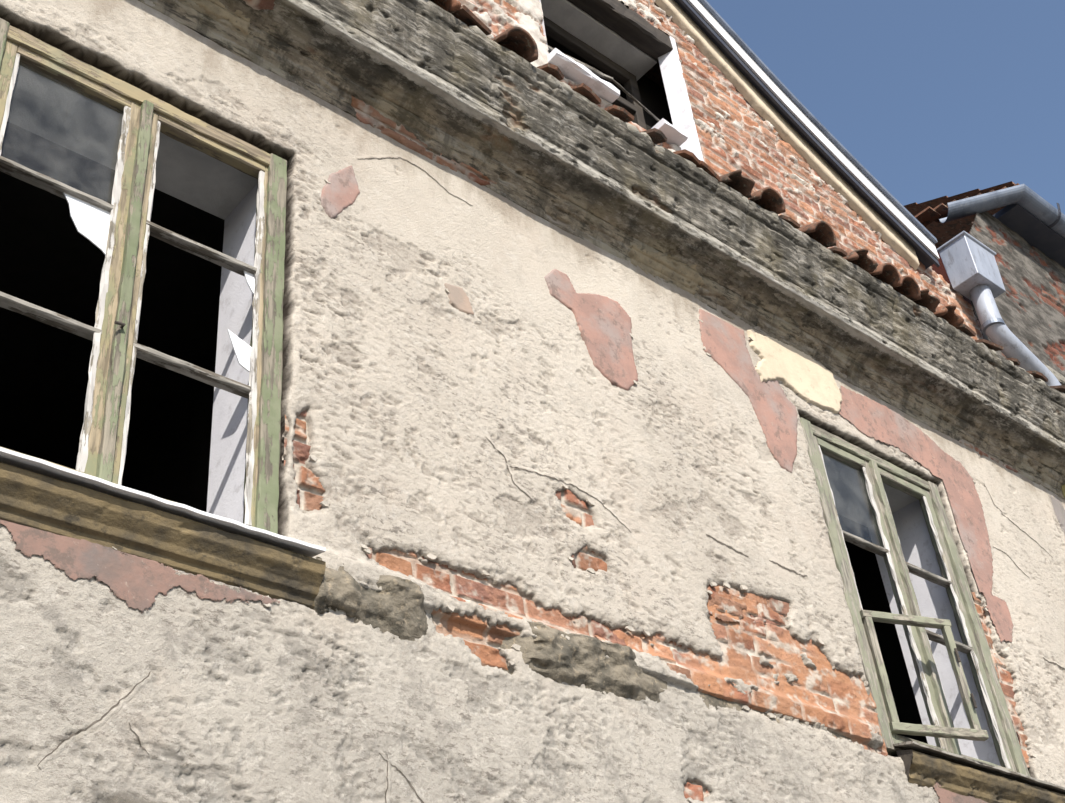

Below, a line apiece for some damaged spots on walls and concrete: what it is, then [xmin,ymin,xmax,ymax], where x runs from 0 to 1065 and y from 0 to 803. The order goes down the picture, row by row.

peeling [320,165,360,219]
crack [356,155,473,206]
peeling [544,269,638,391]
peeling [698,309,798,473]
flaking render [556,484,595,528]
peeling [0,519,280,613]
peeling [839,385,1036,768]
flaking render [360,544,888,756]
crack [37,672,154,770]
crack [379,749,428,803]
flaking render [684,781,710,803]